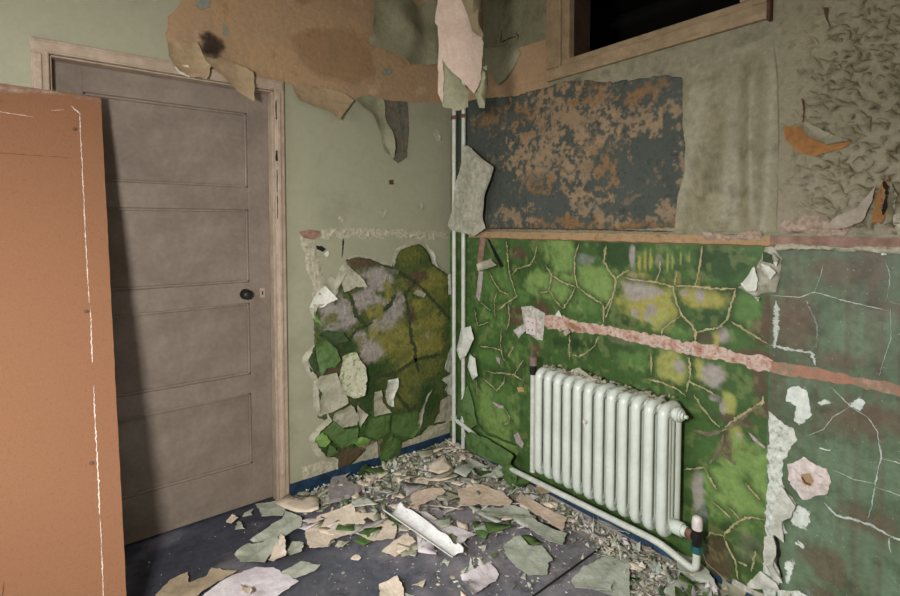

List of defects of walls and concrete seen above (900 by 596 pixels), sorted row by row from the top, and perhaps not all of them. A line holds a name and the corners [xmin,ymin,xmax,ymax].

flaking render [165,0,442,163]
peeling [777,0,900,235]
peeling [302,241,567,575]
crack [474,228,900,578]
flaking render [664,411,807,596]